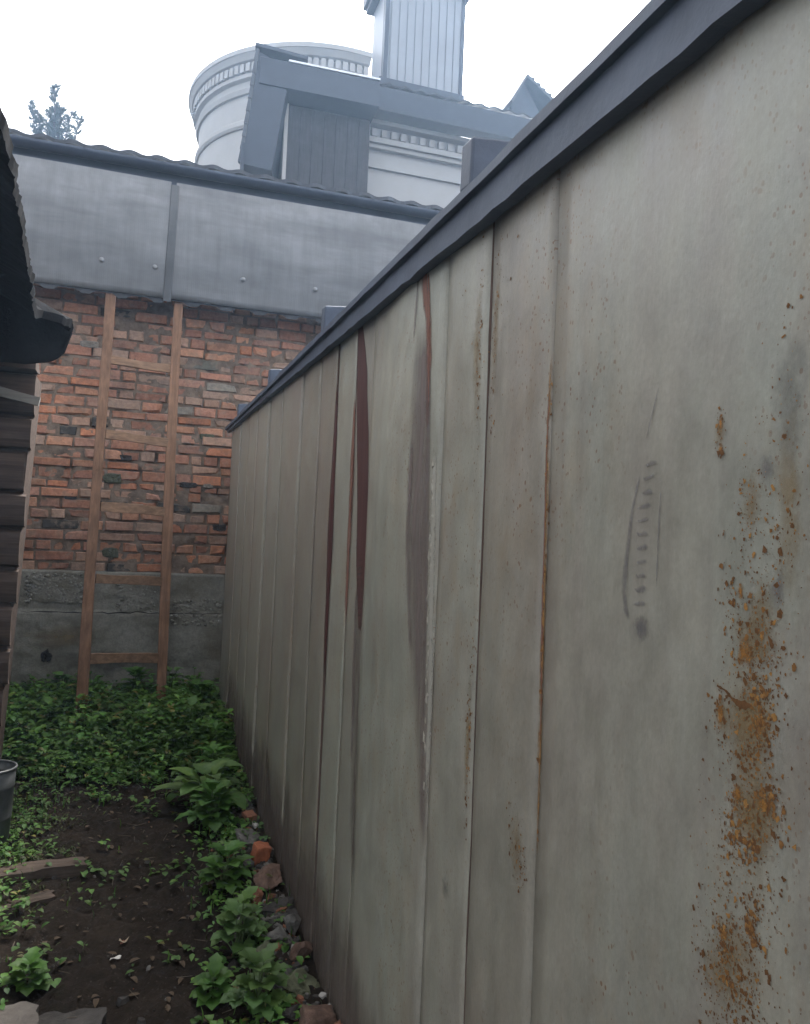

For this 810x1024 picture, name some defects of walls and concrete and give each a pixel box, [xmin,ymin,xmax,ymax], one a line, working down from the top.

corrosion [324,387,338,662]
corrosion [345,402,355,613]
damp [406,348,430,708]
corrosion [506,366,553,893]
corrosion [691,406,810,1024]